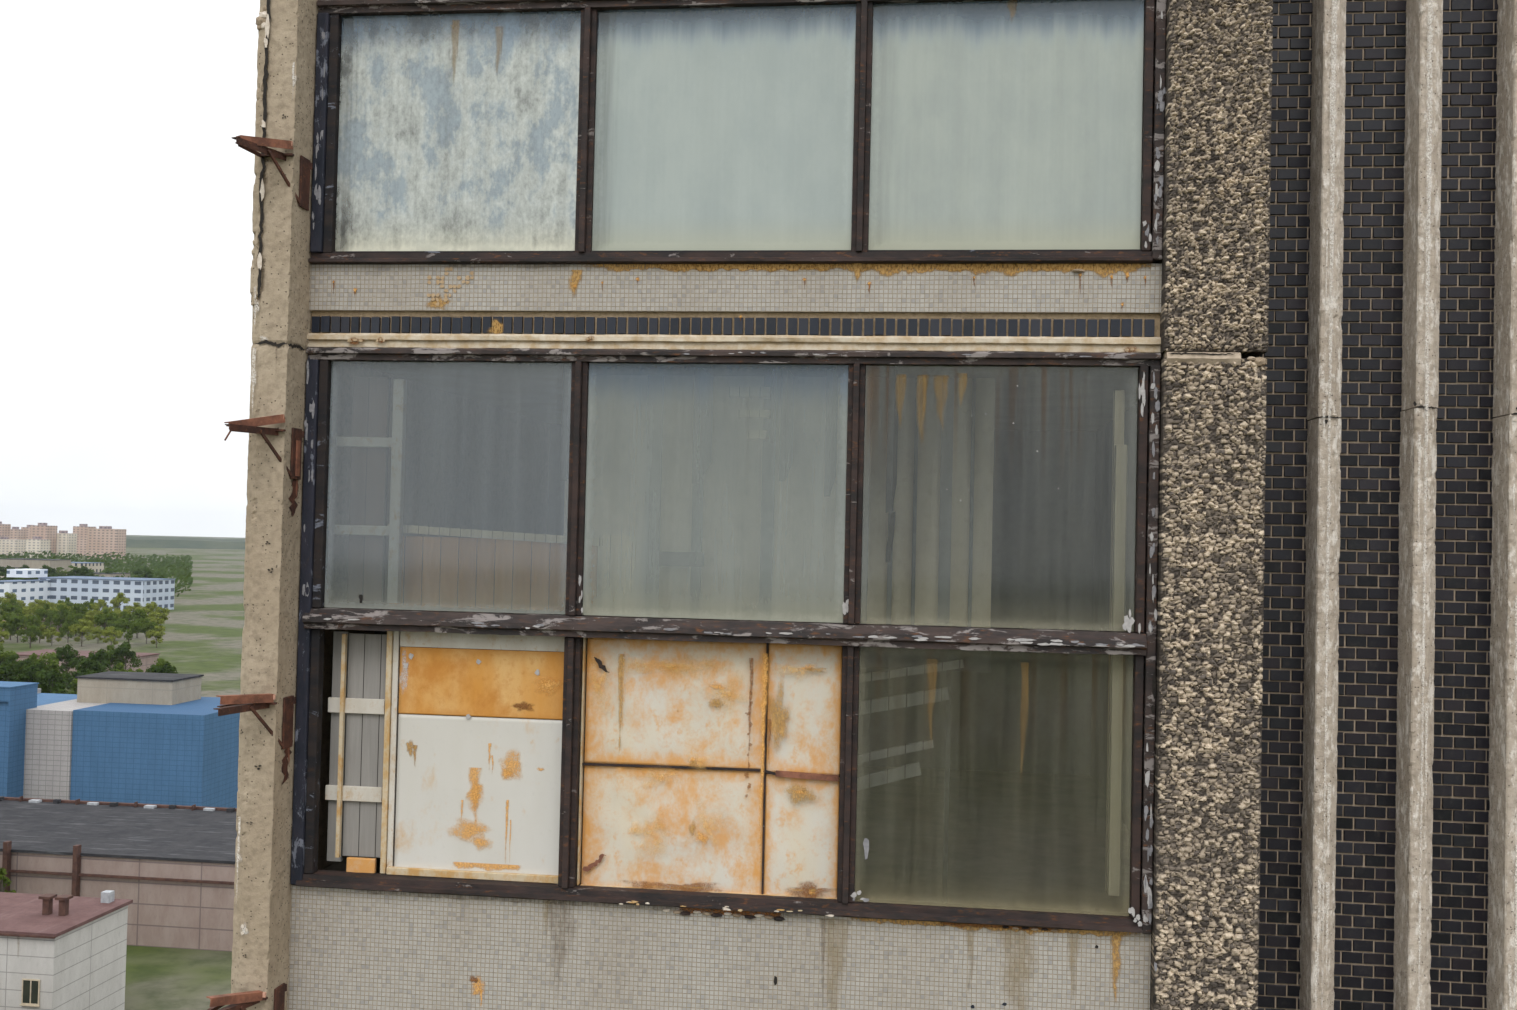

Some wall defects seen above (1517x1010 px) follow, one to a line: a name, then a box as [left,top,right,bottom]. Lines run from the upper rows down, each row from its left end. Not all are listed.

peeling [1007,508,1158,647]
rust [281,747,292,784]
rust [581,638,842,898]
water stain [1112,934,1122,998]